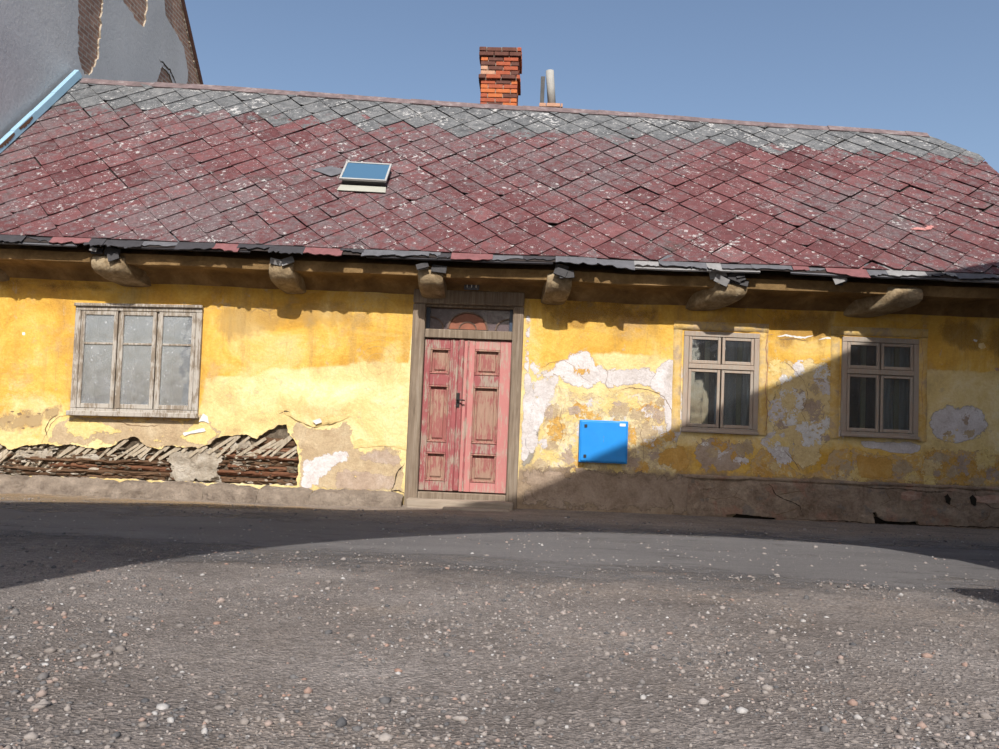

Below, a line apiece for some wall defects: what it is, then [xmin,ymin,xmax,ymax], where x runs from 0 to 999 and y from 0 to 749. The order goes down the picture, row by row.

flaking render [78,0,103,75]
flaking render [123,0,148,27]
flaking render [157,67,173,83]
flaking render [164,0,200,84]
peeling [521,316,999,504]
flaking render [0,406,407,492]
crack [768,484,999,528]